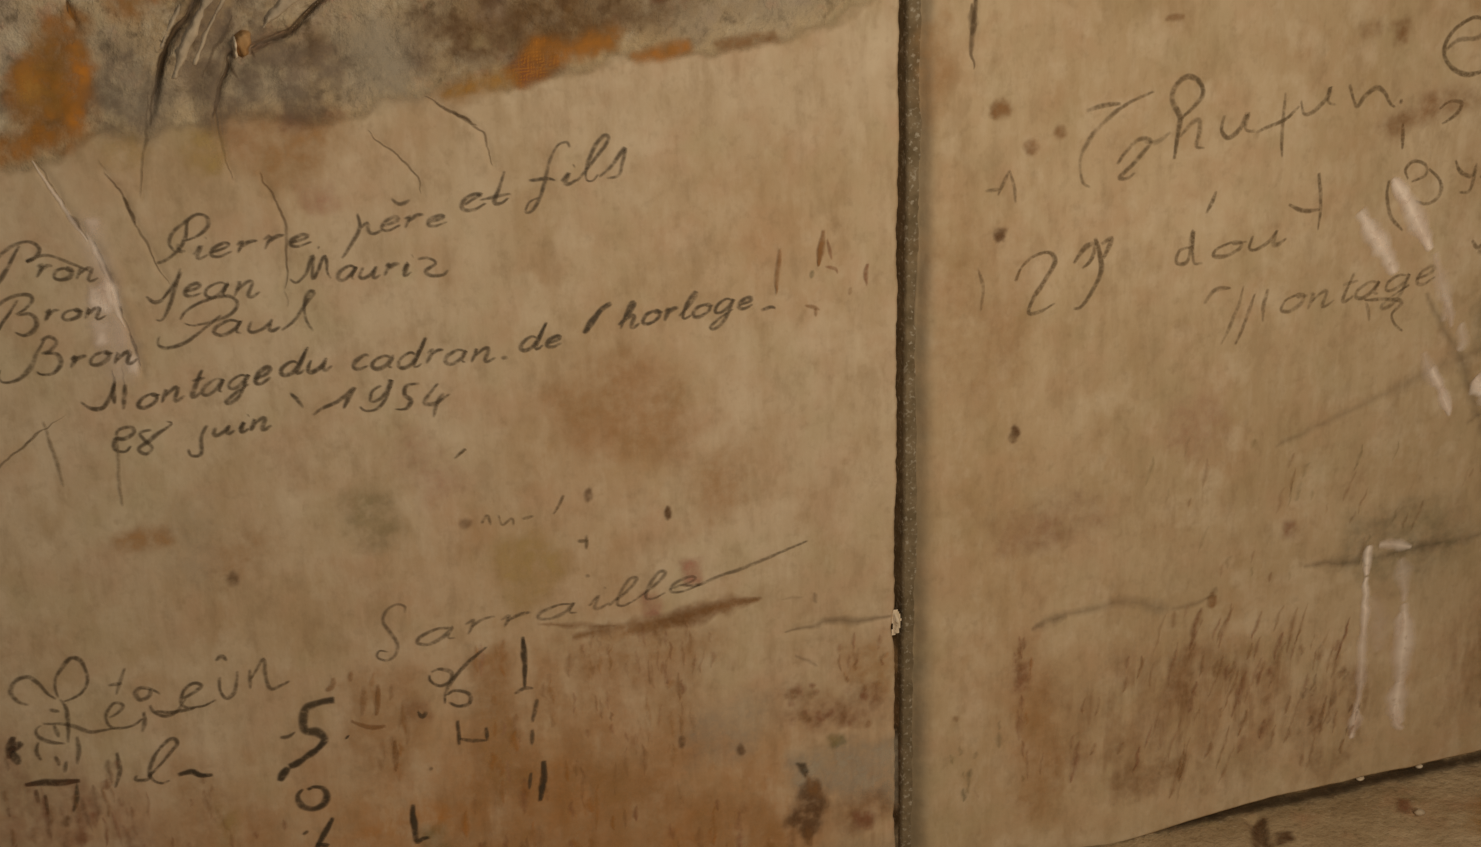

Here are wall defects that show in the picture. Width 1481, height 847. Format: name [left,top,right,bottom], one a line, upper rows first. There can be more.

spalling [0,0,871,345]